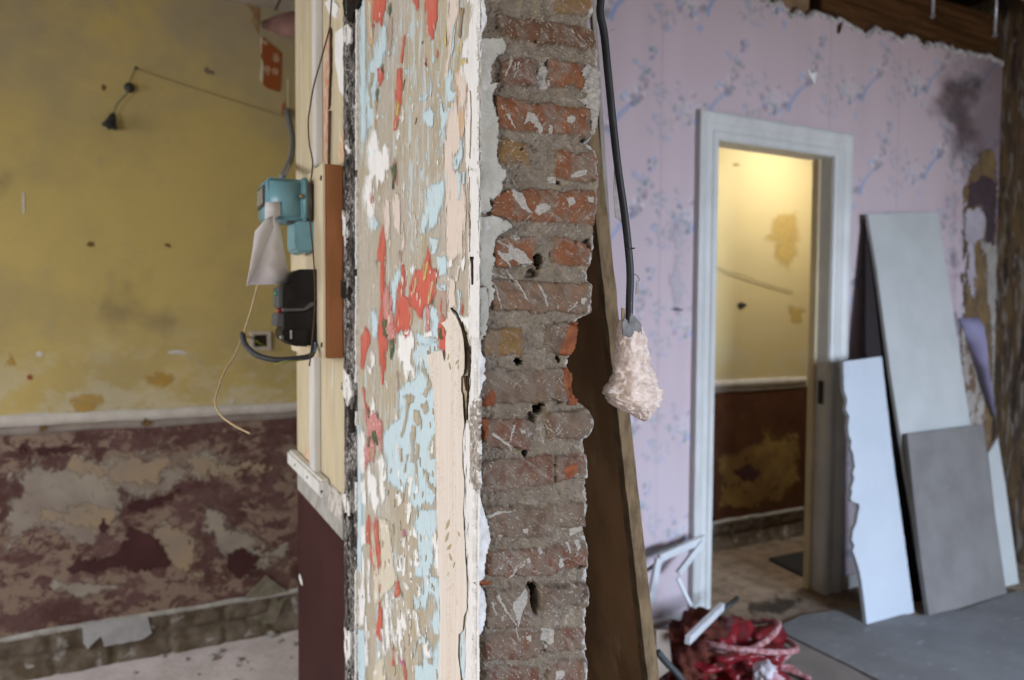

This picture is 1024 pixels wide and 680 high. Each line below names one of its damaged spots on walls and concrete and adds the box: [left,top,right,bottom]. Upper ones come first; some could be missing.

flaking render [747,0,1004,66]
peeling [362,102,414,234]
water stain [941,81,980,150]
peeling [397,330,432,382]
crack [444,308,471,420]
flaking render [468,0,598,680]
peeling [959,148,999,451]
peeling [4,445,282,552]
peeling [150,508,290,578]
peeling [342,430,440,667]
peeling [712,428,805,552]
flaking render [0,593,298,680]